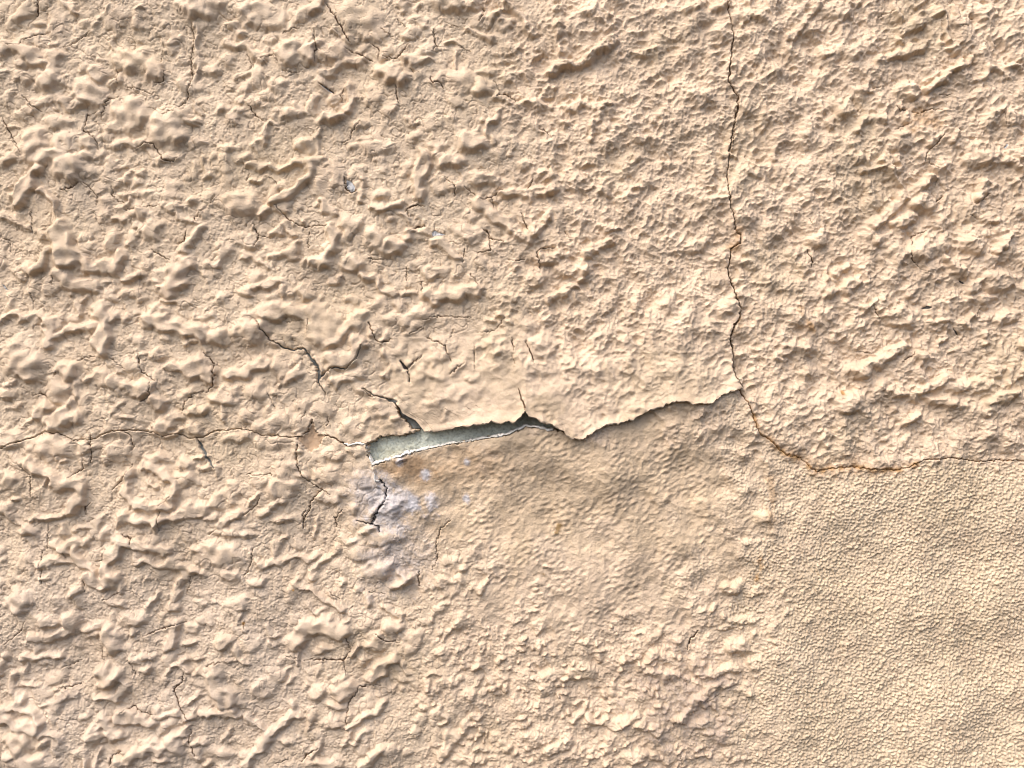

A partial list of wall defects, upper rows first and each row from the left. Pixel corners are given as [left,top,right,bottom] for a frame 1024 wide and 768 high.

crack [726,1,1013,472]
crack [0,353,388,532]
crack [258,315,534,404]
efflorescence [357,476,436,534]
flaking render [344,296,743,482]